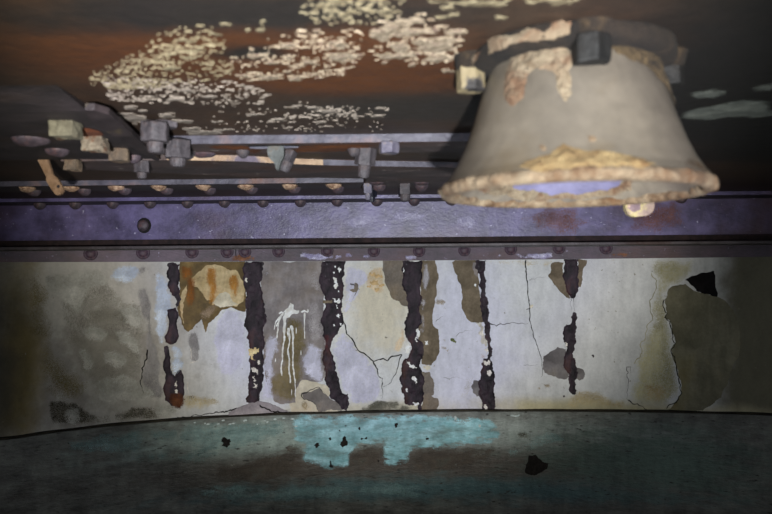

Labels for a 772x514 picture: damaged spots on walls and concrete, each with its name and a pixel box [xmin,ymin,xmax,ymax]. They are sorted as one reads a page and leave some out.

rust [177,255,255,332]
peeling [149,260,501,490]
crack [342,313,402,397]
crack [490,260,543,375]
spalling [543,259,587,397]
flaking render [662,271,740,411]